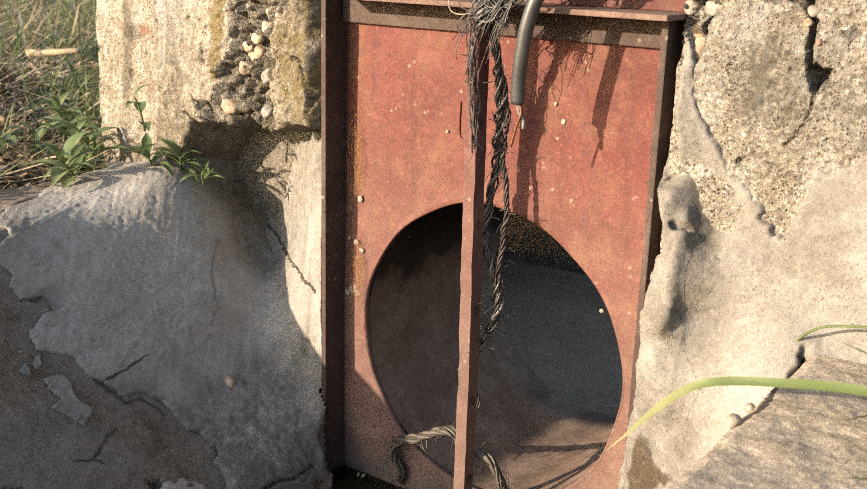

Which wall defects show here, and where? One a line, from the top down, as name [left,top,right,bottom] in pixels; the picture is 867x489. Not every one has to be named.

spalling [677,0,727,67]
spalling [803,0,821,27]
spalling [191,0,292,130]
crack [786,0,824,146]
spalling [809,62,833,95]
peeling [43,374,93,427]
crack [92,354,166,416]
crack [75,427,118,464]